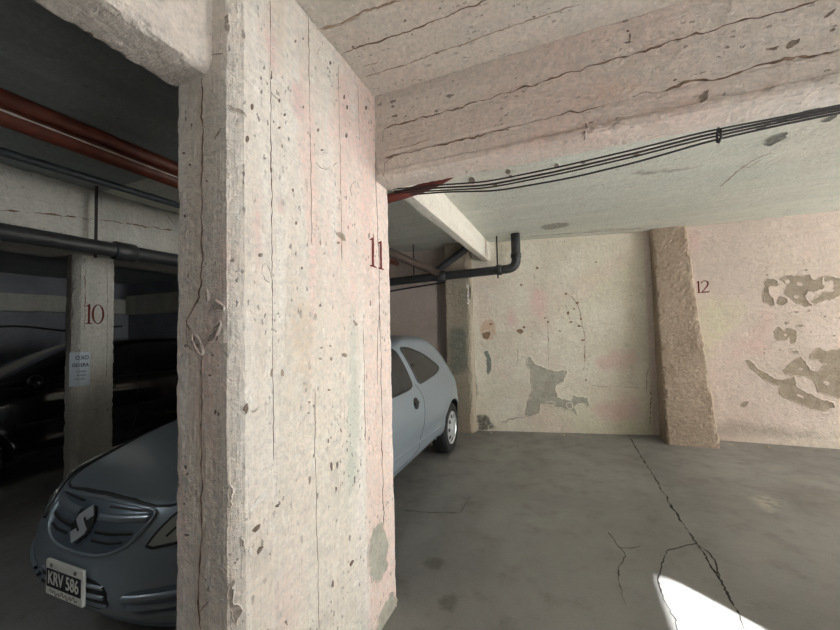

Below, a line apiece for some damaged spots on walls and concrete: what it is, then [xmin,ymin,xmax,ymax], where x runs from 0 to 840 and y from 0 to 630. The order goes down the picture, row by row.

crack [308,0,398,54]
crack [338,0,580,96]
crack [383,0,818,132]
crack [310,119,358,256]
crack [344,50,838,522]
peeling [763,269,840,313]
crack [186,78,221,629]
peeling [525,356,591,418]
peeling [745,321,840,412]
crack [608,532,639,604]
crack [628,435,747,630]